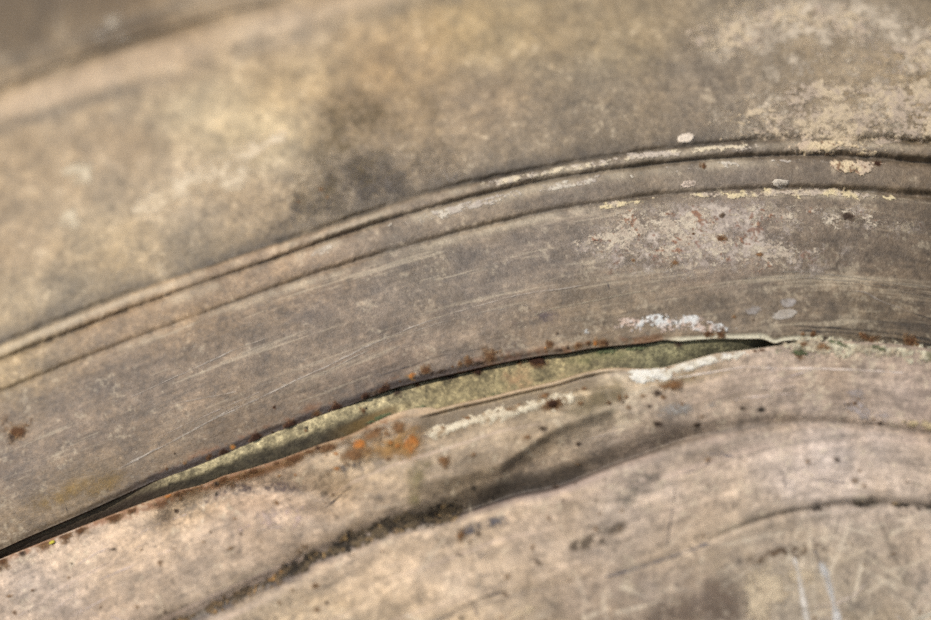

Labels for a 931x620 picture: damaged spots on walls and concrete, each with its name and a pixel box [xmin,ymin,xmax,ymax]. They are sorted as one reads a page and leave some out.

rust [517,332,608,366]
rust [359,349,498,413]
rust [539,393,566,412]
rust [641,377,694,408]
rust [249,410,320,442]
rust [273,421,419,477]
crack [0,338,818,559]